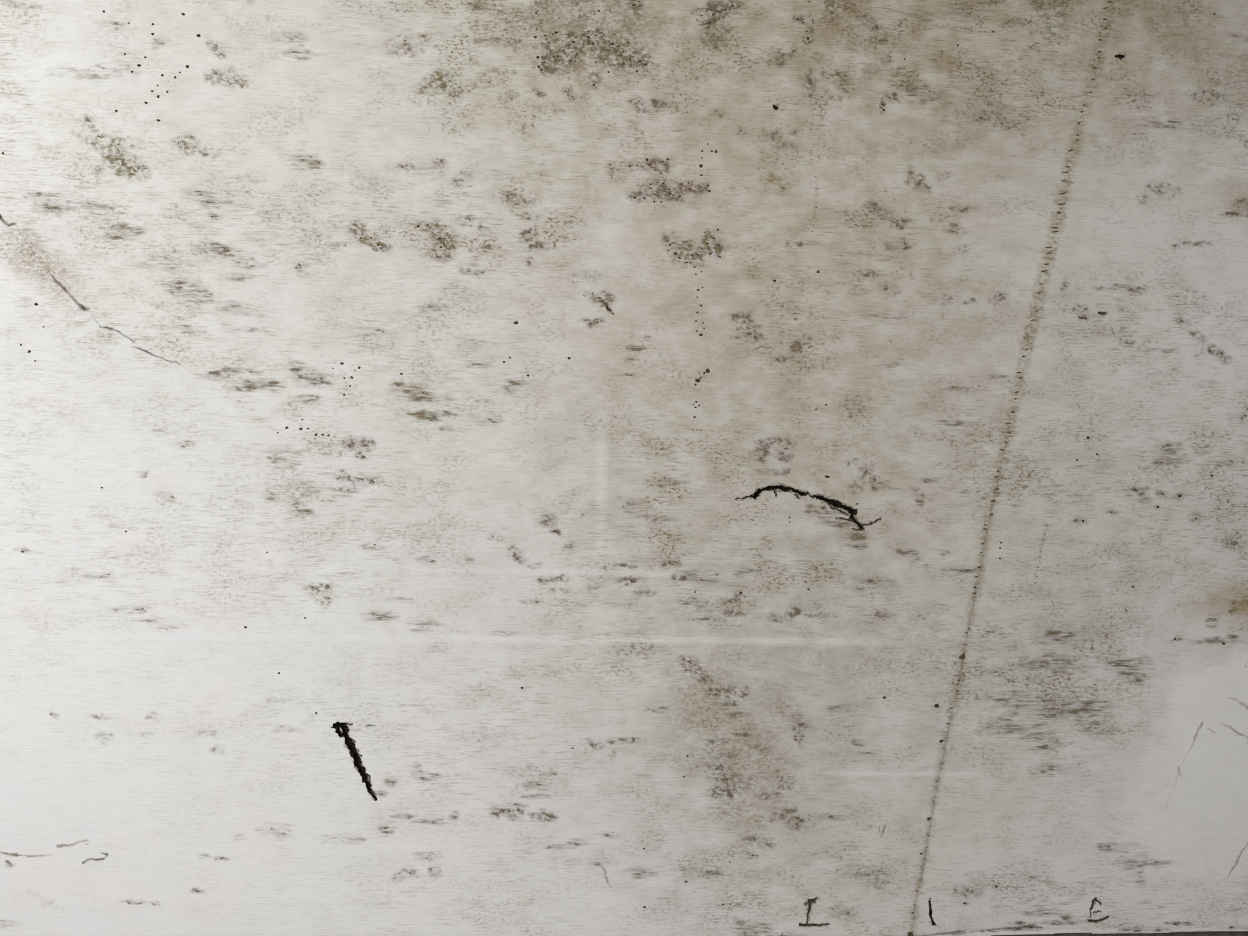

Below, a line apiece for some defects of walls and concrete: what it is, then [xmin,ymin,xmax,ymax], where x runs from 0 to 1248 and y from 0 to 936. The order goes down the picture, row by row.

damp [534,2,653,86]
damp [696,1,741,49]
damp [629,158,711,203]
damp [416,223,455,258]
damp [507,191,543,264]
damp [664,229,723,268]